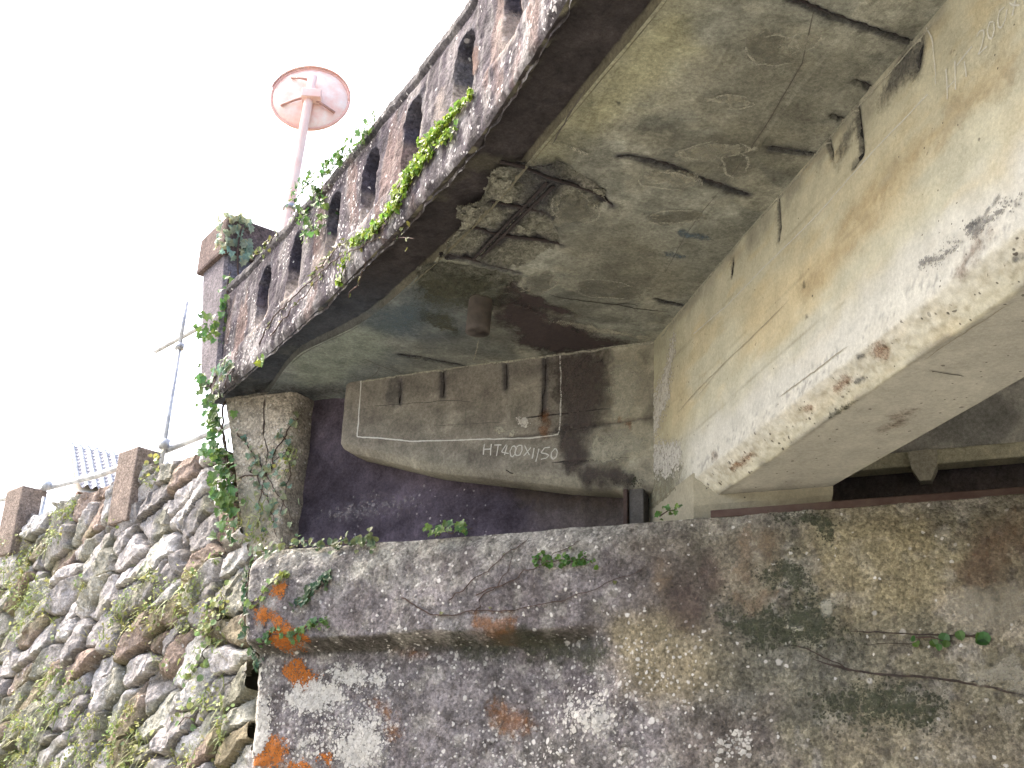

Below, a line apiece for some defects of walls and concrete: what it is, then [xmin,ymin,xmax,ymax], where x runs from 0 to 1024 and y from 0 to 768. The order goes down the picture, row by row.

spalling [411,160,613,311]
damp [361,24,931,512]
crack [667,1,816,269]
crack [261,399,269,465]